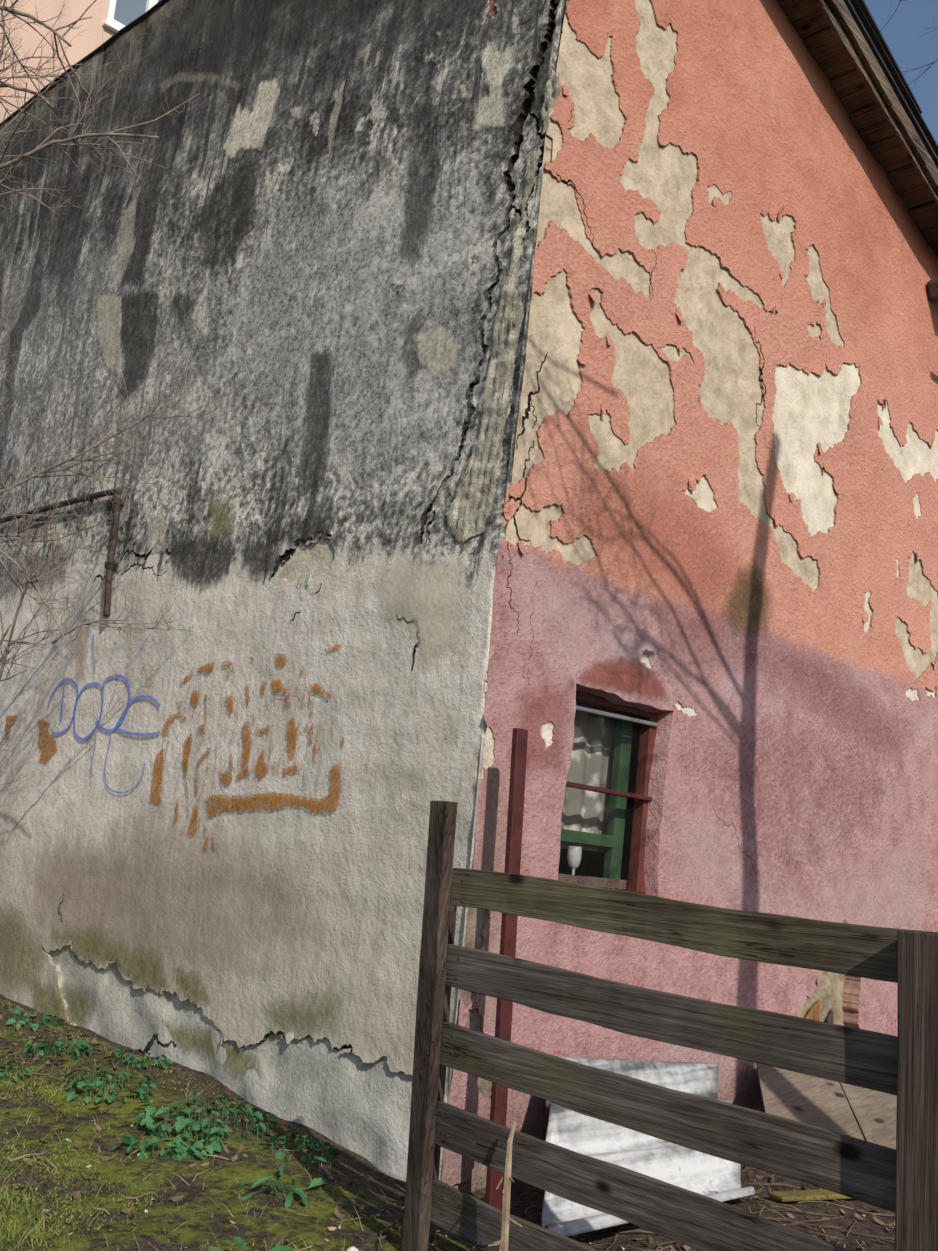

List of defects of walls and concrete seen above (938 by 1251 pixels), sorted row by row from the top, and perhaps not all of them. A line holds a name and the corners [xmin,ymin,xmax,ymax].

water stain [5,175,85,398]
water stain [97,96,174,397]
water stain [197,80,279,267]
water stain [473,43,514,129]
crack [420,0,594,544]
spalling [503,0,862,592]
water stain [170,351,336,588]
crack [506,352,548,685]
spalling [877,397,938,519]
spalling [894,551,938,701]
spalling [41,944,413,1182]
spalling [791,970,861,1029]